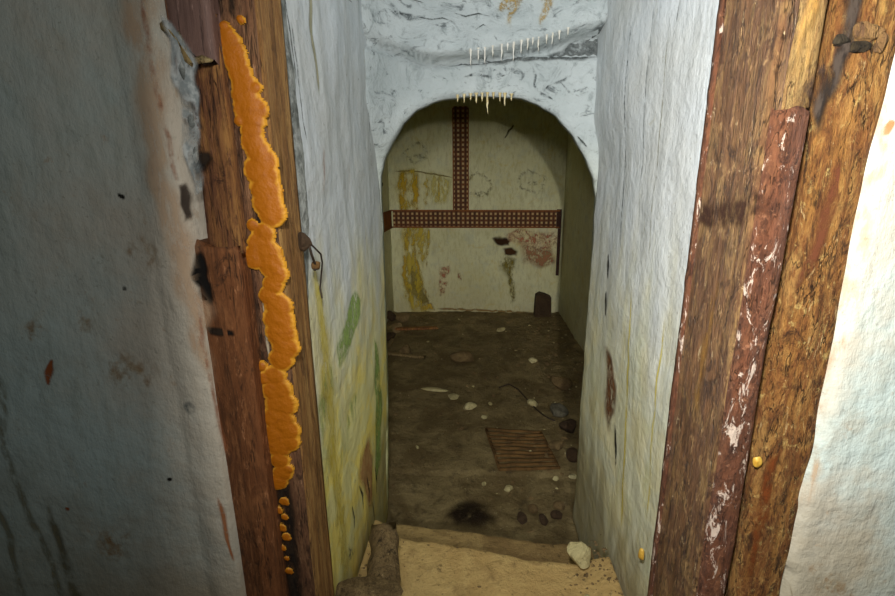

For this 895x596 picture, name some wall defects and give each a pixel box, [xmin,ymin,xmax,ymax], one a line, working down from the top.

leakage [459,26,603,65]
leakage [397,149,449,210]
leakage [402,228,521,313]